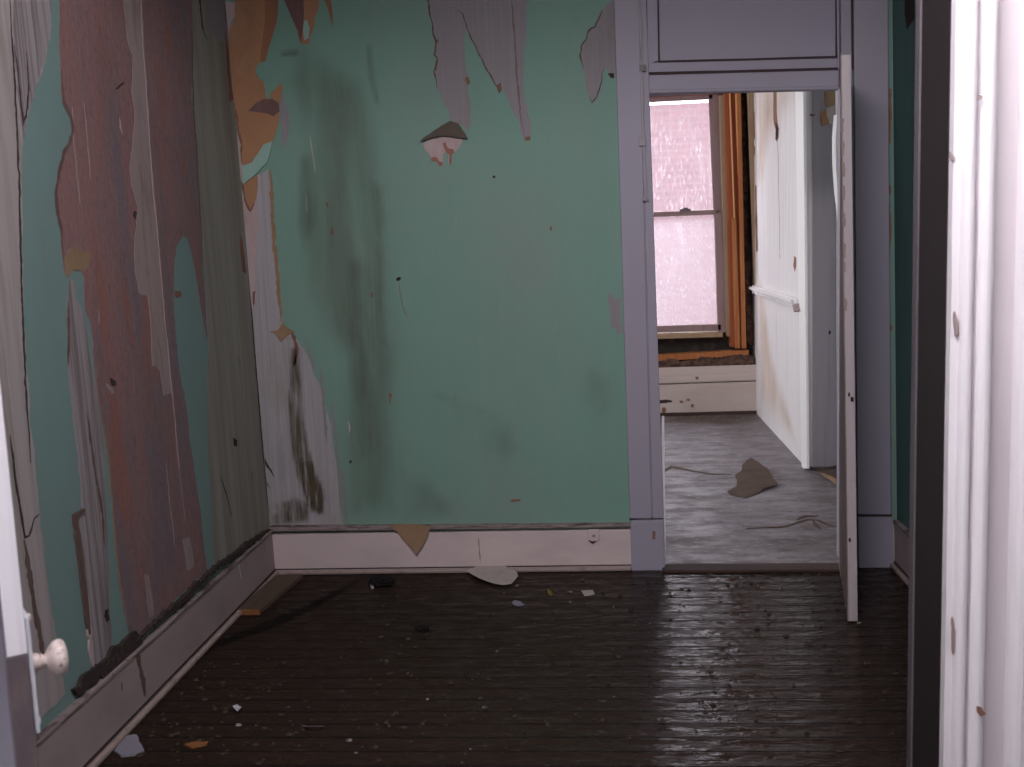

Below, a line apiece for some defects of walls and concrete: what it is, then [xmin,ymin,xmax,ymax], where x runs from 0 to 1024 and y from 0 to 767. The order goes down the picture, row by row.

peeling [423,0,531,166]
peeling [579,0,616,103]
peeling [0,0,354,718]
leakage [284,349,322,522]